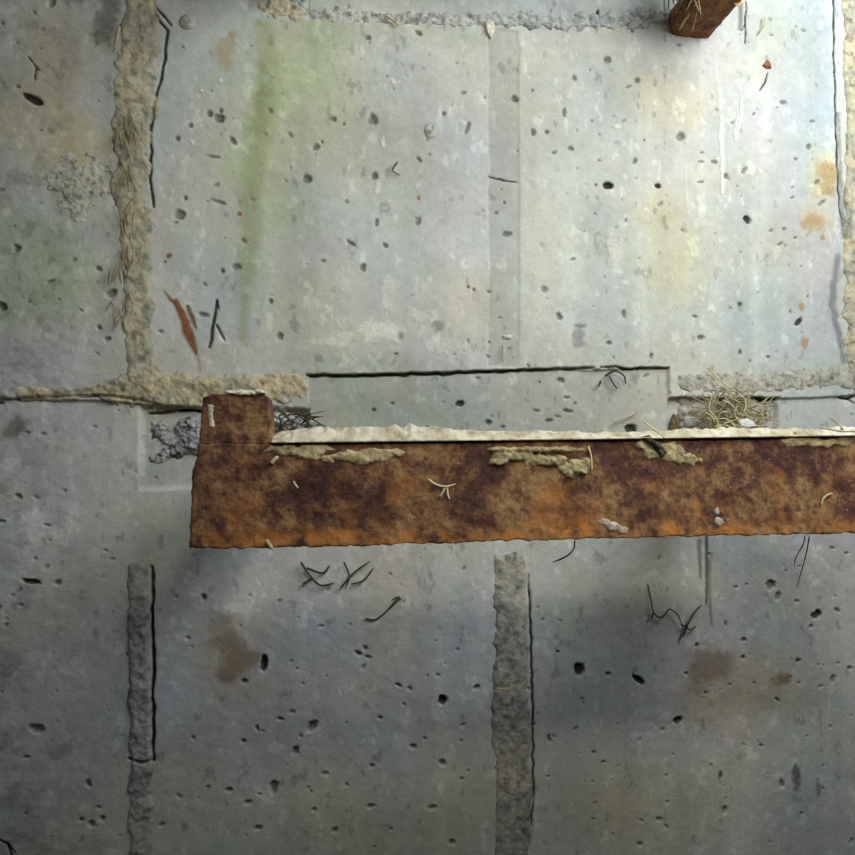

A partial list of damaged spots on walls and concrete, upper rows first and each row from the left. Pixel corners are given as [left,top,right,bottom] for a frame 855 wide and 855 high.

crack [832,0,842,220]
crack [307,366,667,378]
crack [527,574,535,824]